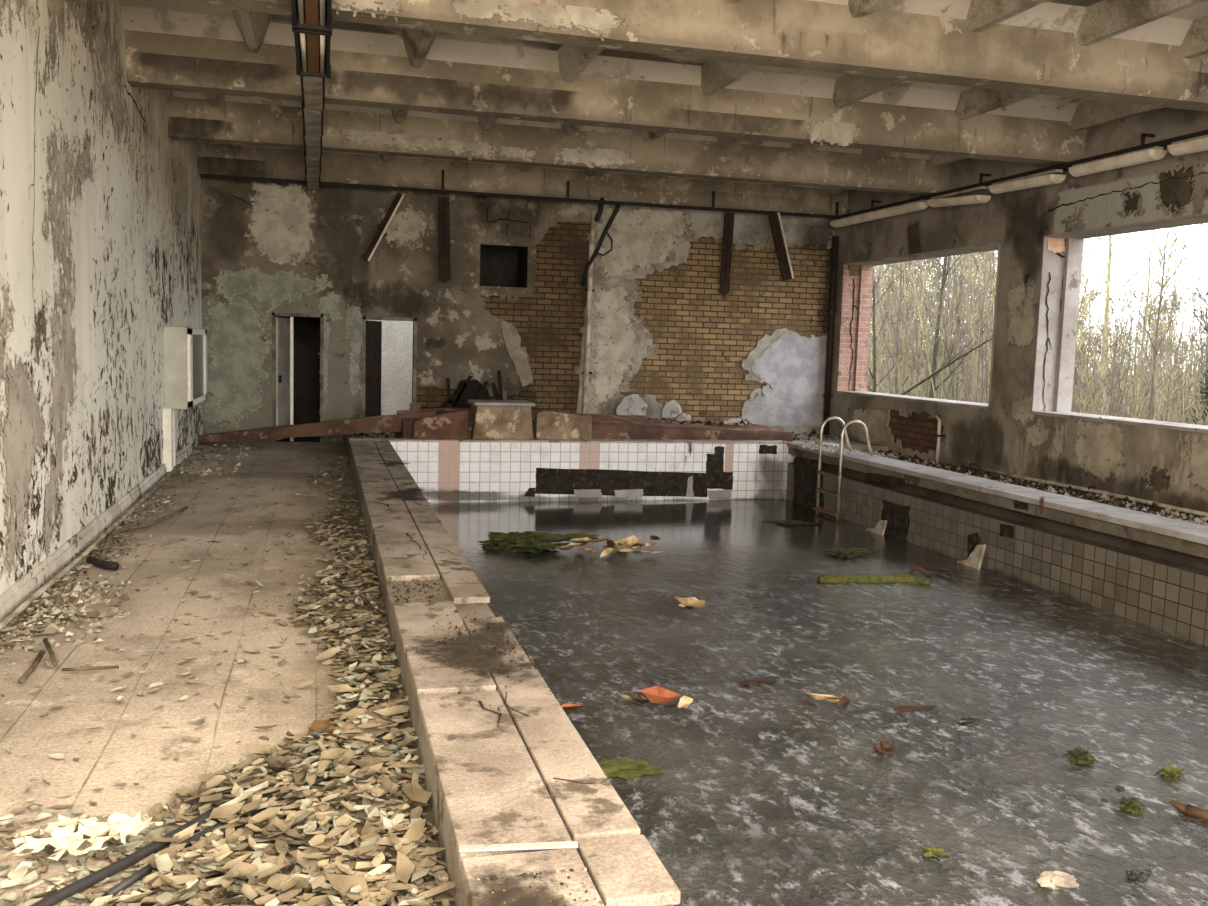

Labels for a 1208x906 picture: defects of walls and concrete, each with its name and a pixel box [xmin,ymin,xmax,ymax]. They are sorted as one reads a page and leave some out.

peeling [448,0,641,41]
peeling [339,129,537,161]
peeling [560,141,636,169]
peeling [805,121,865,147]
damp [318,200,422,314]
peeling [0,0,157,584]
peeling [145,181,366,429]
spalling [470,205,832,427]
spalling [409,386,456,410]
spalling [848,406,946,455]
peeling [525,446,733,500]